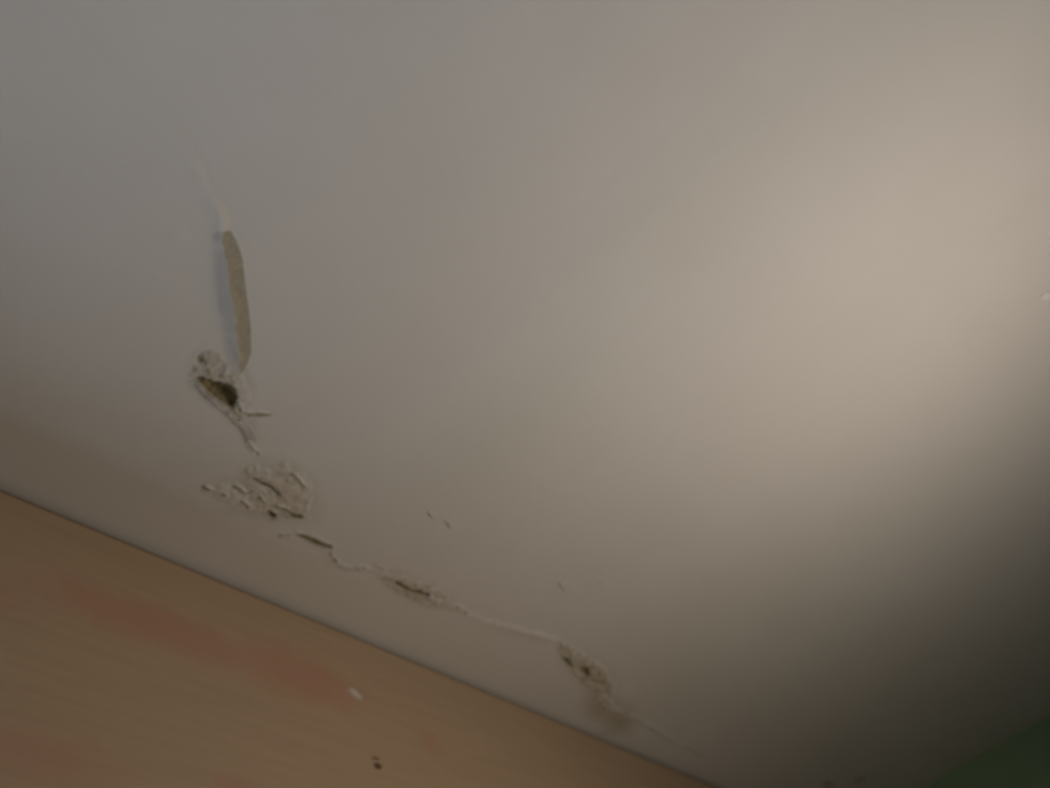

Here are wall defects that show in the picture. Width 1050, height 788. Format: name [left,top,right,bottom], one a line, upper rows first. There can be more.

peeling [185,229,316,526]